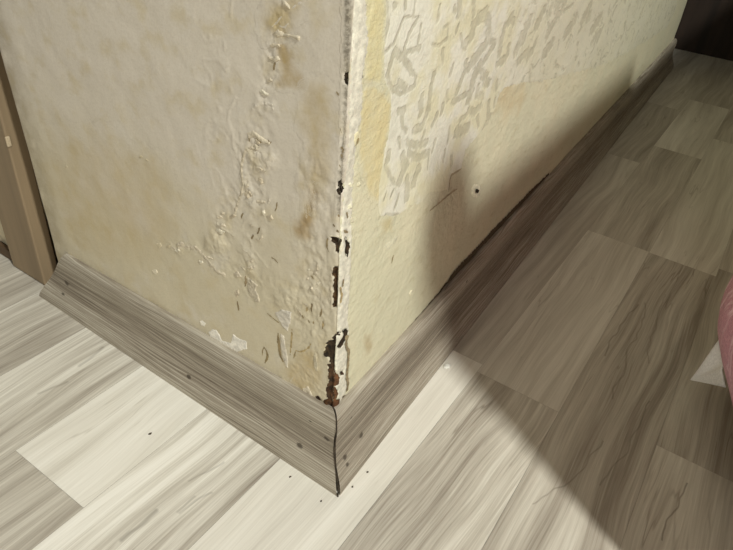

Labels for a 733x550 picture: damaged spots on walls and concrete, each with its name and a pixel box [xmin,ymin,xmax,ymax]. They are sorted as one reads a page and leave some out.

leakage [254,0,339,247]
flaking render [297,0,369,401]
leakage [356,0,392,205]
peeling [200,320,247,352]
rust [315,332,345,408]
crack [332,407,340,497]